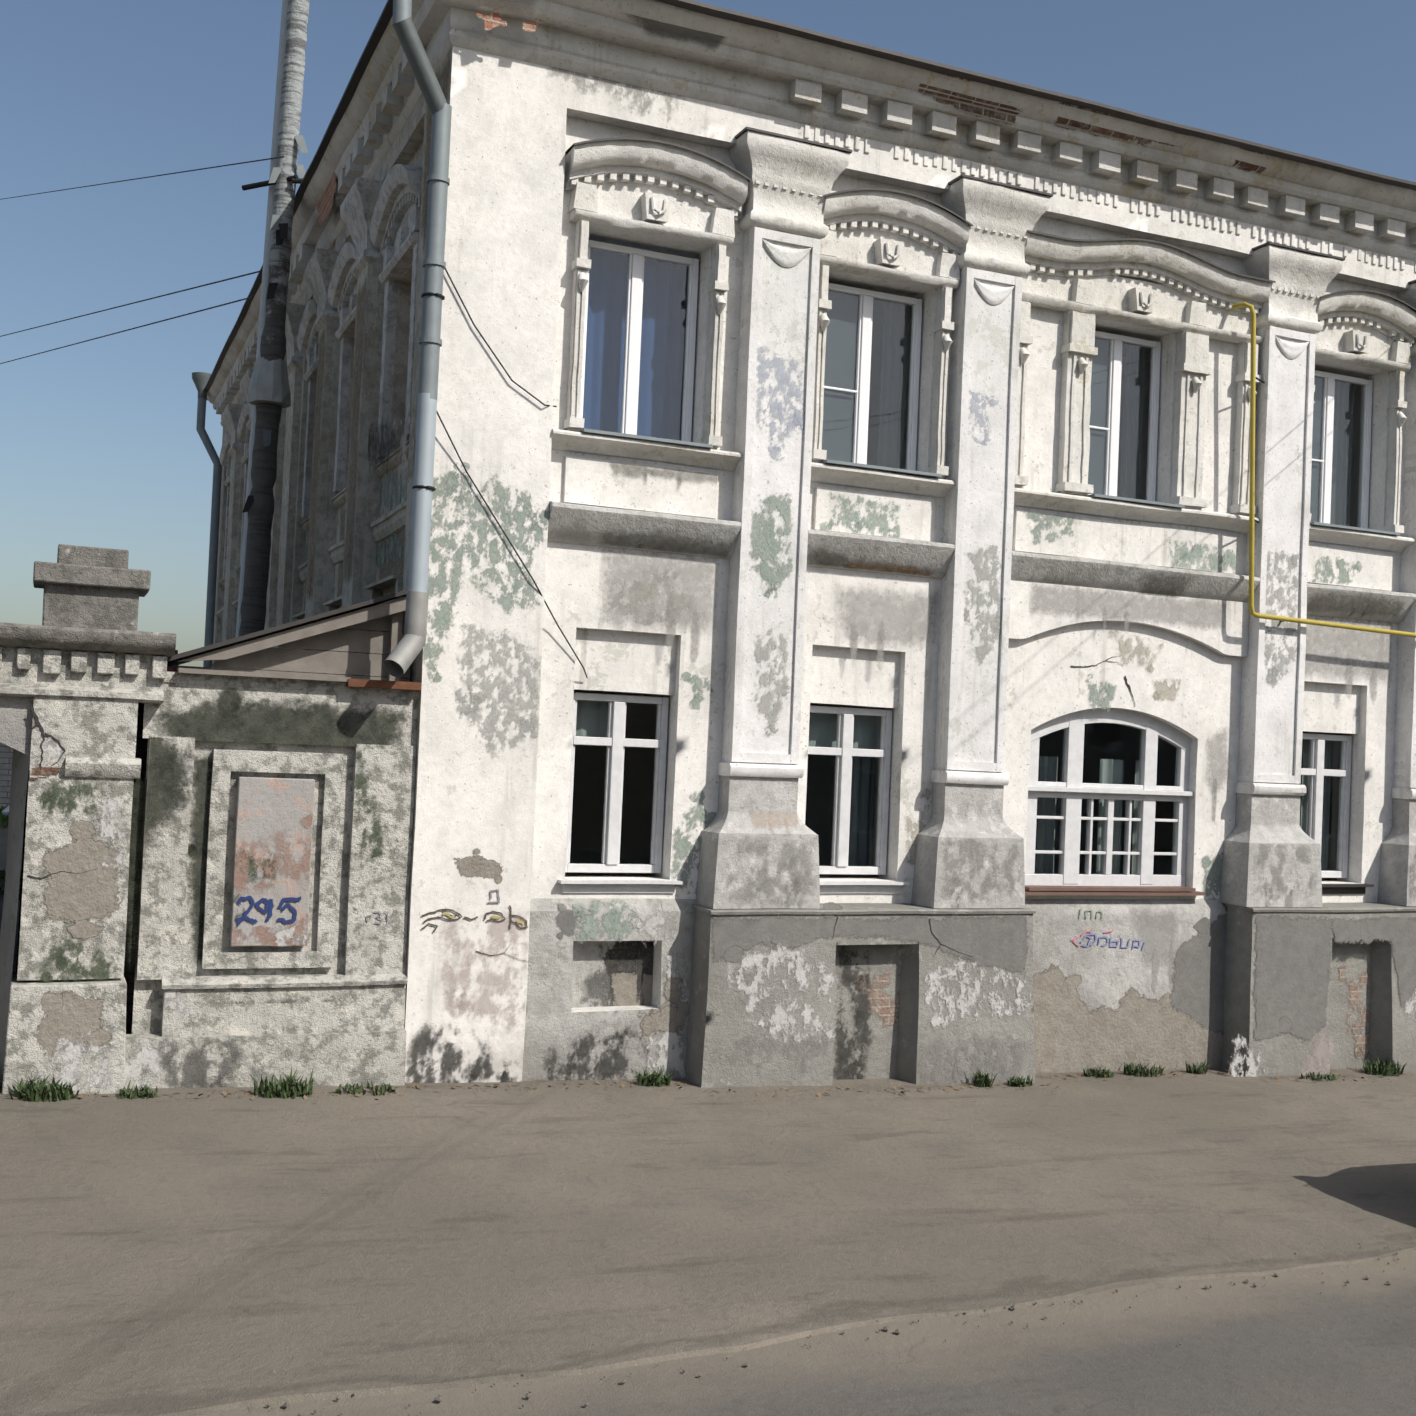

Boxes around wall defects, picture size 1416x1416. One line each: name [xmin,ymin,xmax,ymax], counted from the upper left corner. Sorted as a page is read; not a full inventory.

peeling [724,945,836,1045]
flaking render [857,972,900,1027]
flaking render [924,853,1266,1077]